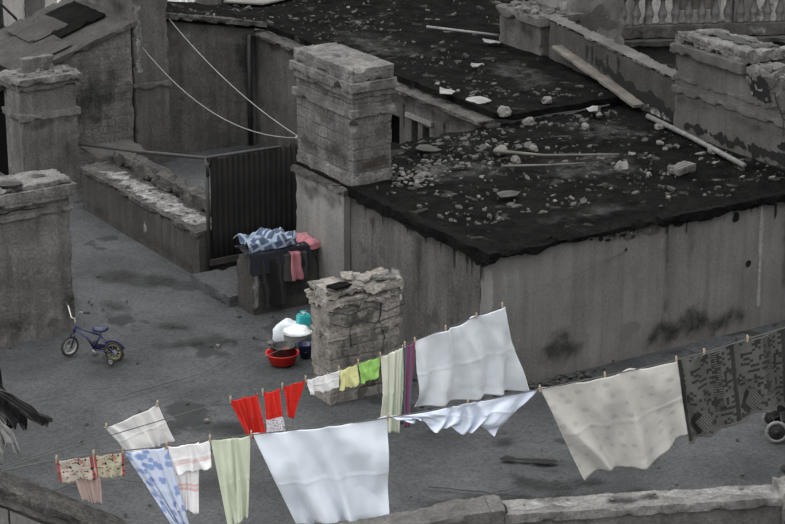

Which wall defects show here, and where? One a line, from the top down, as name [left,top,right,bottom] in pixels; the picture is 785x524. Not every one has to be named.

spalling [746,74,771,103]
spalling [684,123,785,167]